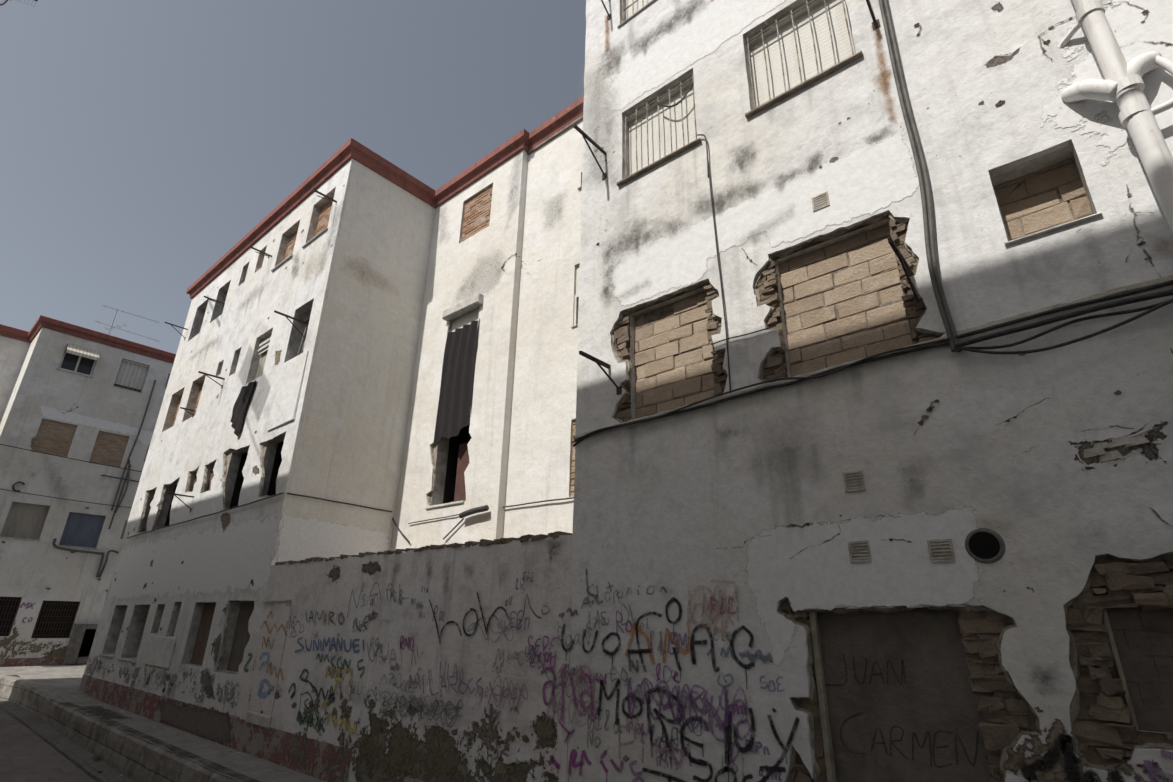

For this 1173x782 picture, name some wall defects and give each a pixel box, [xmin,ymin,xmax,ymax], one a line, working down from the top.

flaking render [613,314,632,363]
flaking render [704,283,728,397]
flaking render [757,257,787,383]
flaking render [616,377,632,422]
peeling [1060,417,1173,476]
crack [1080,425,1161,457]
flaking render [327,561,343,586]
flaking render [781,600,811,628]
flaking render [958,556,1173,782]
flaking render [793,690,821,721]
flaking render [789,743,828,782]